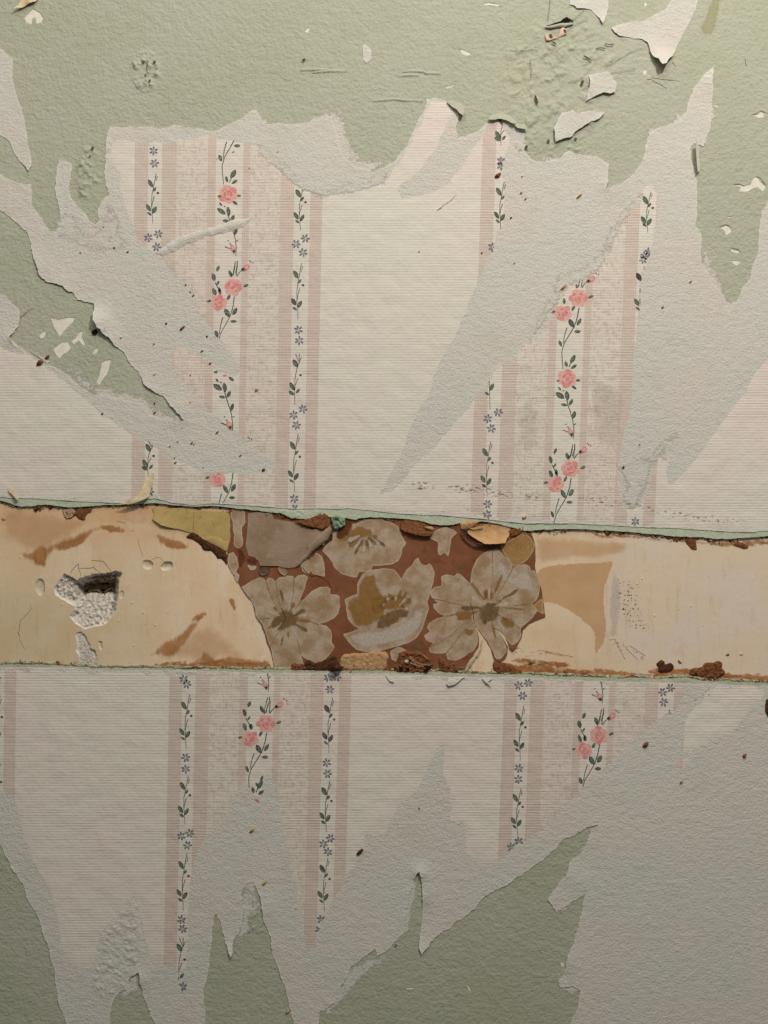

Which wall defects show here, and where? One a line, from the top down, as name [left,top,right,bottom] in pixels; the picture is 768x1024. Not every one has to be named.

peeling [24,9,43,24]
peeling [129,48,164,93]
peeling [489,113,527,129]
peeling [733,176,766,192]
peeling [39,317,111,385]
peeling [269,509,321,519]
leakage [24,526,124,565]
leakage [159,536,186,548]
leakage [537,542,645,652]
flaking render [54,570,122,667]
leakage [155,613,270,669]